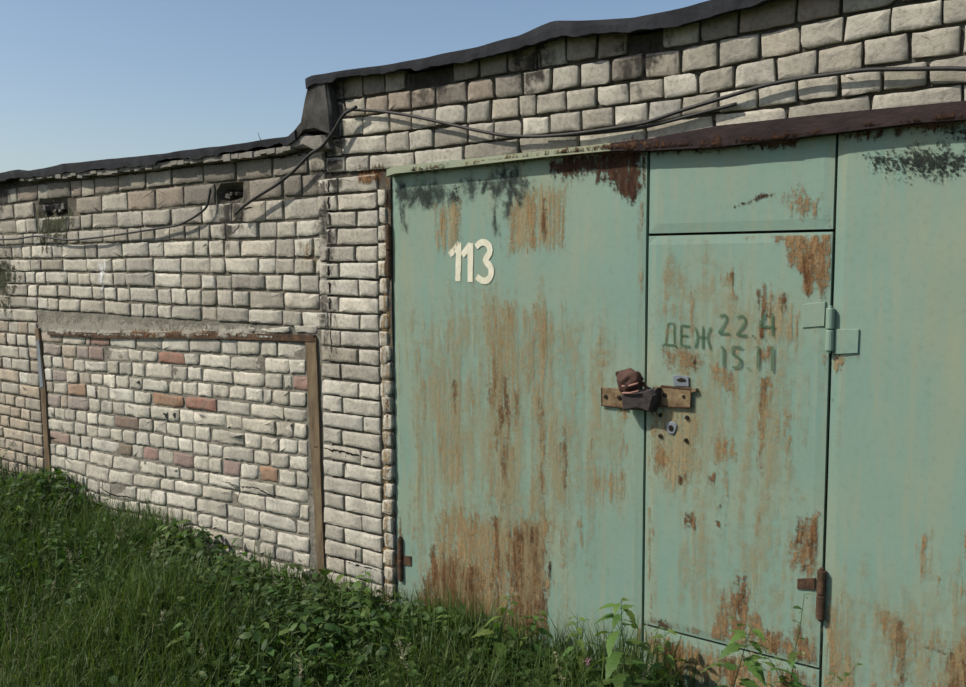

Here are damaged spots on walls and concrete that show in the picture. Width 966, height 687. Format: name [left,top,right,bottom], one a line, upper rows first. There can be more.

corrosion [840,109,966,141]
corrosion [500,128,828,258]
corrosion [775,234,831,298]
corrosion [756,286,798,364]
corrosion [662,347,735,395]
corrosion [419,298,570,640]
corrosion [648,408,701,492]
corrosion [756,376,791,462]
corrosion [789,512,820,578]
corrosion [638,574,854,687]
corrosion [876,611,919,687]
corrosion [927,629,966,687]